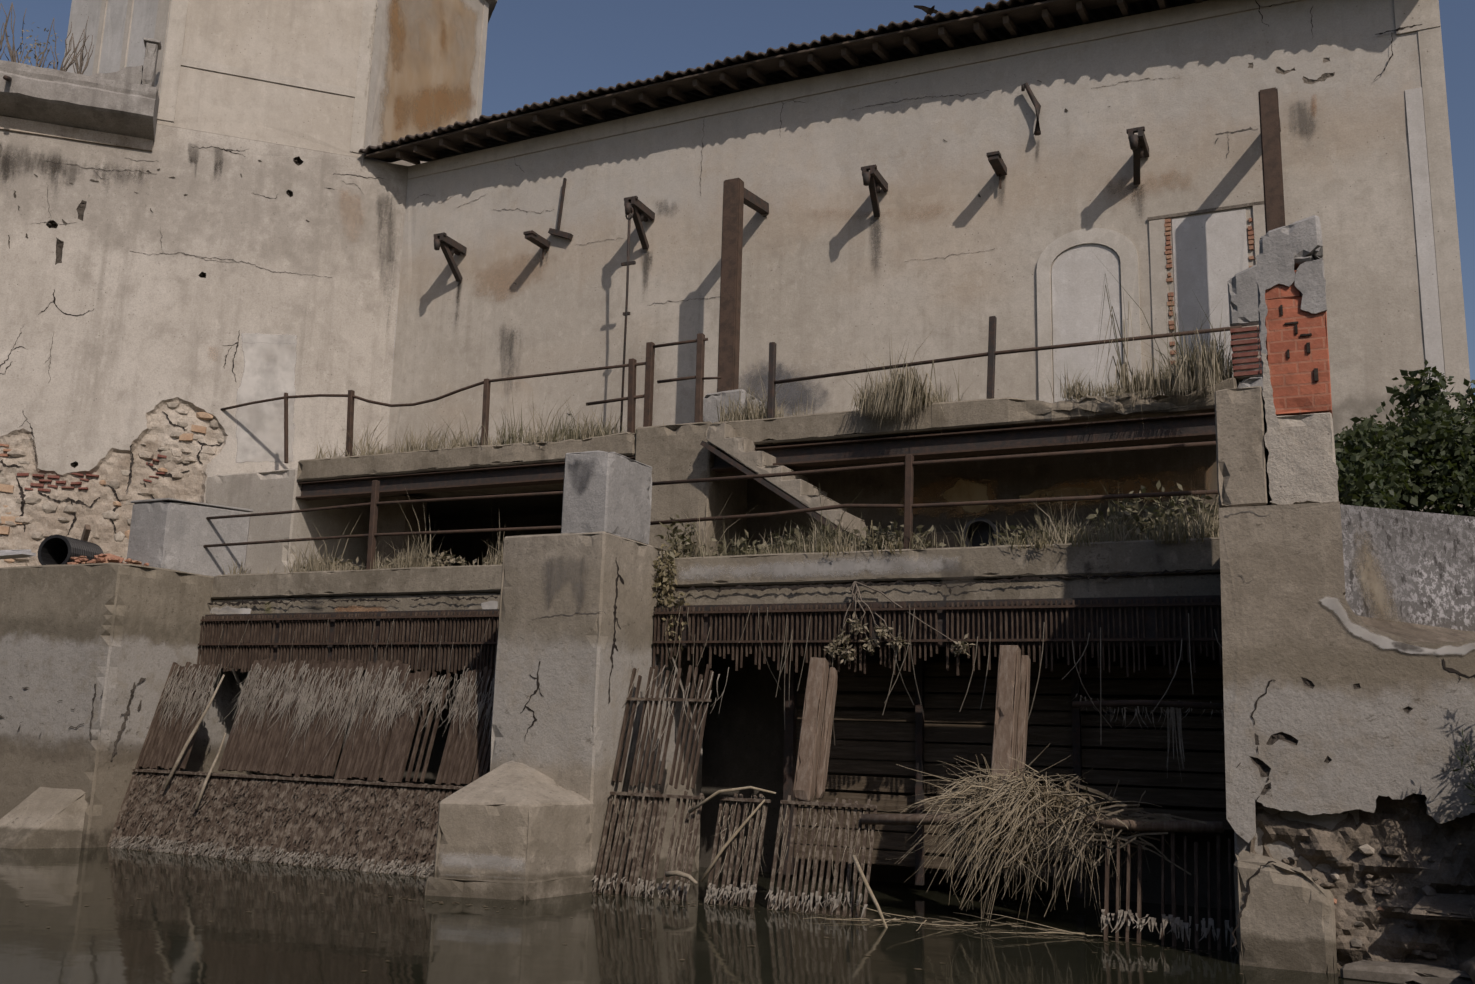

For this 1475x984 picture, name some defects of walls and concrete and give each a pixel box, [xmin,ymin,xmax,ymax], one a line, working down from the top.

spalling [1275,57,1335,85]
crack [1374,24,1422,80]
leakage [0,152,72,179]
crack [0,290,94,383]
crack [0,411,222,535]
flaking render [0,397,228,568]
crack [207,595,498,606]
crack [533,557,1203,704]
crack [0,678,146,761]
crack [521,661,544,742]
spalling [1249,732,1475,970]